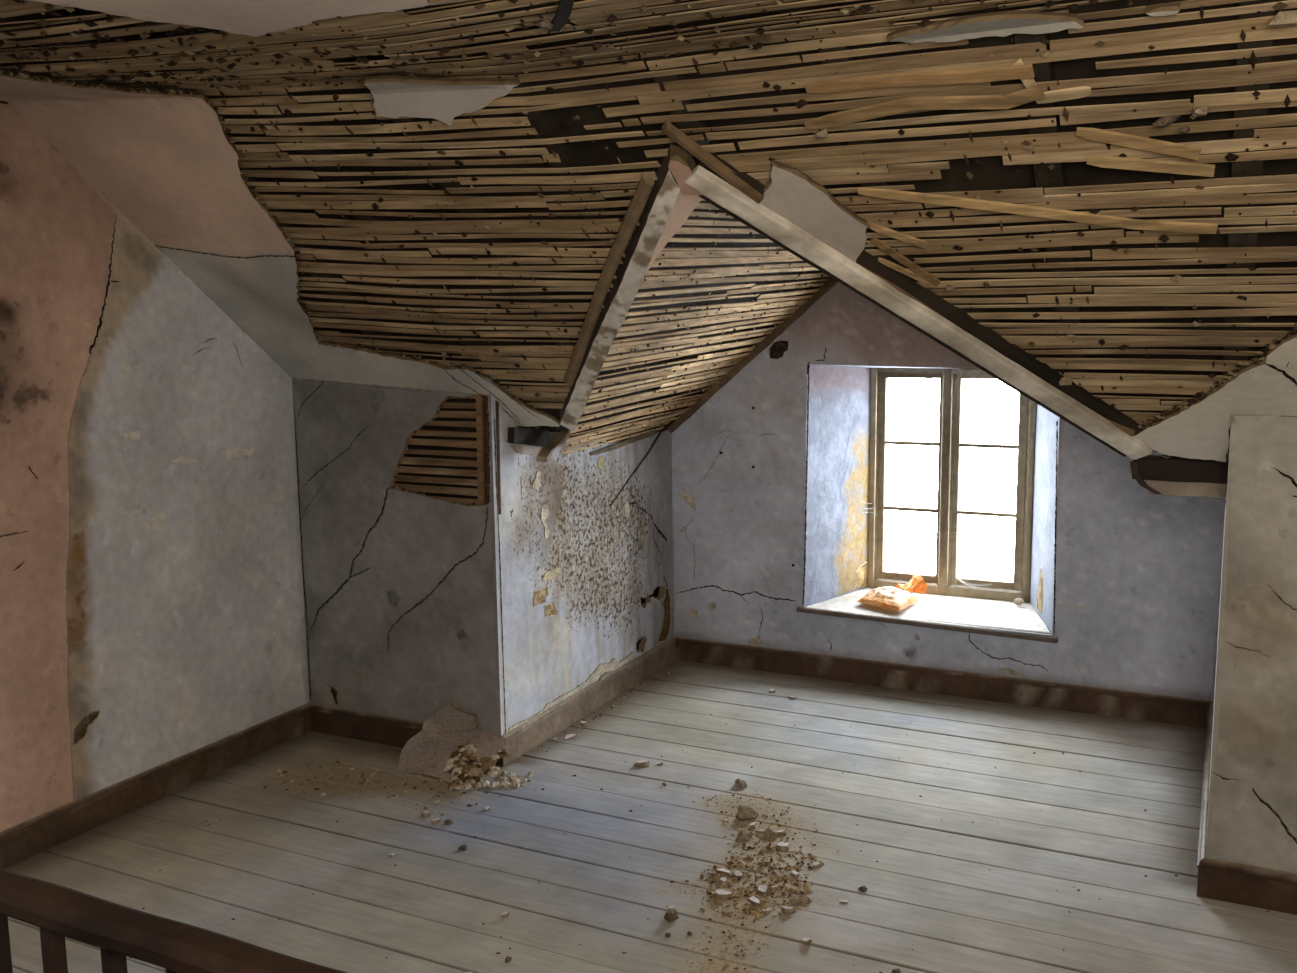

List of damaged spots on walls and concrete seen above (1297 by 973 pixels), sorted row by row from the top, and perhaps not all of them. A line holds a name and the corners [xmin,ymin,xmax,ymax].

water stain [0,131,72,434]
crack [81,215,119,381]
flaking render [0,0,1297,514]
crack [1265,362,1297,387]
crack [294,380,389,699]
crack [387,366,540,731]
peeling [540,507,550,538]
peeling [533,567,563,617]
crack [629,349,827,631]
crack [1051,421,1059,634]
crack [1271,467,1297,497]
crack [1211,771,1297,844]